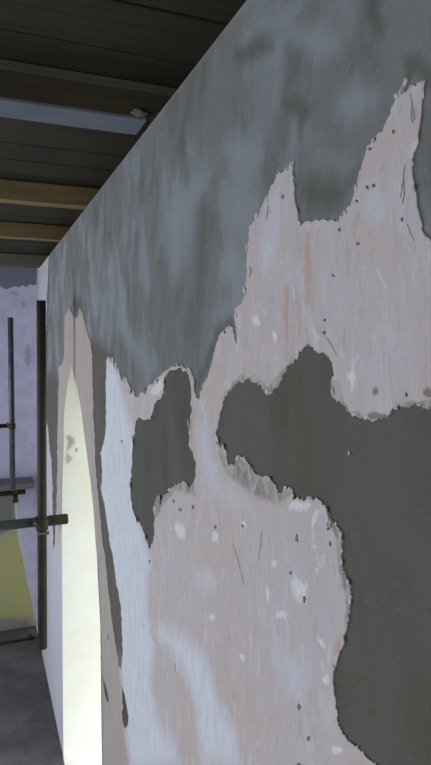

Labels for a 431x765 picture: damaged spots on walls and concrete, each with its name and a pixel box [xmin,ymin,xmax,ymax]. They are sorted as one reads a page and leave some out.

damp [70,284,85,318]
peeling [39,0,431,399]
damp [87,0,431,667]
peeling [46,421,57,516]
peeling [42,525,63,754]
spalling [98,580,109,739]
peeling [100,346,431,765]